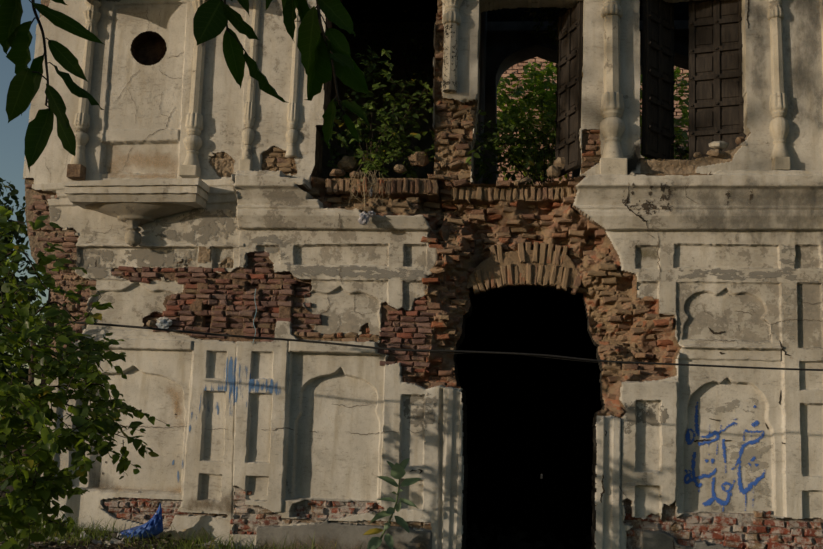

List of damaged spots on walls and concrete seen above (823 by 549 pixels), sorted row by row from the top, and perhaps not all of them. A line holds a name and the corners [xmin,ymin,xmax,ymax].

spalling [434,0,478,183]
spalling [208,151,235,177]
spalling [261,146,297,176]
spalling [22,178,436,376]
peeling [622,399,669,434]
spalling [99,486,432,535]
spalling [623,441,823,549]